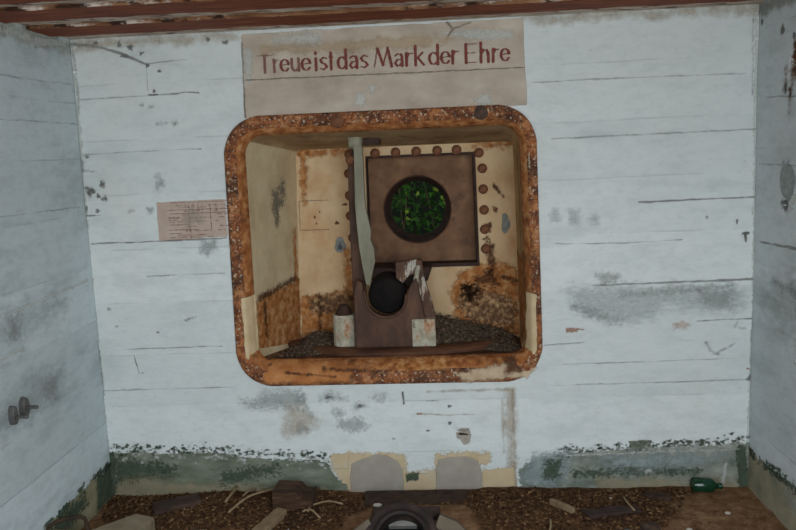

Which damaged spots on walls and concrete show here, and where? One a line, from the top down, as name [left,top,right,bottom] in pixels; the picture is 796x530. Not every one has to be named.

spalling [781,25,796,101]
rust [297,148,345,204]
spalling [780,165,795,211]
rust [257,231,354,349]
rust [451,241,527,340]
rust [262,360,379,385]
peeling [44,355,796,530]